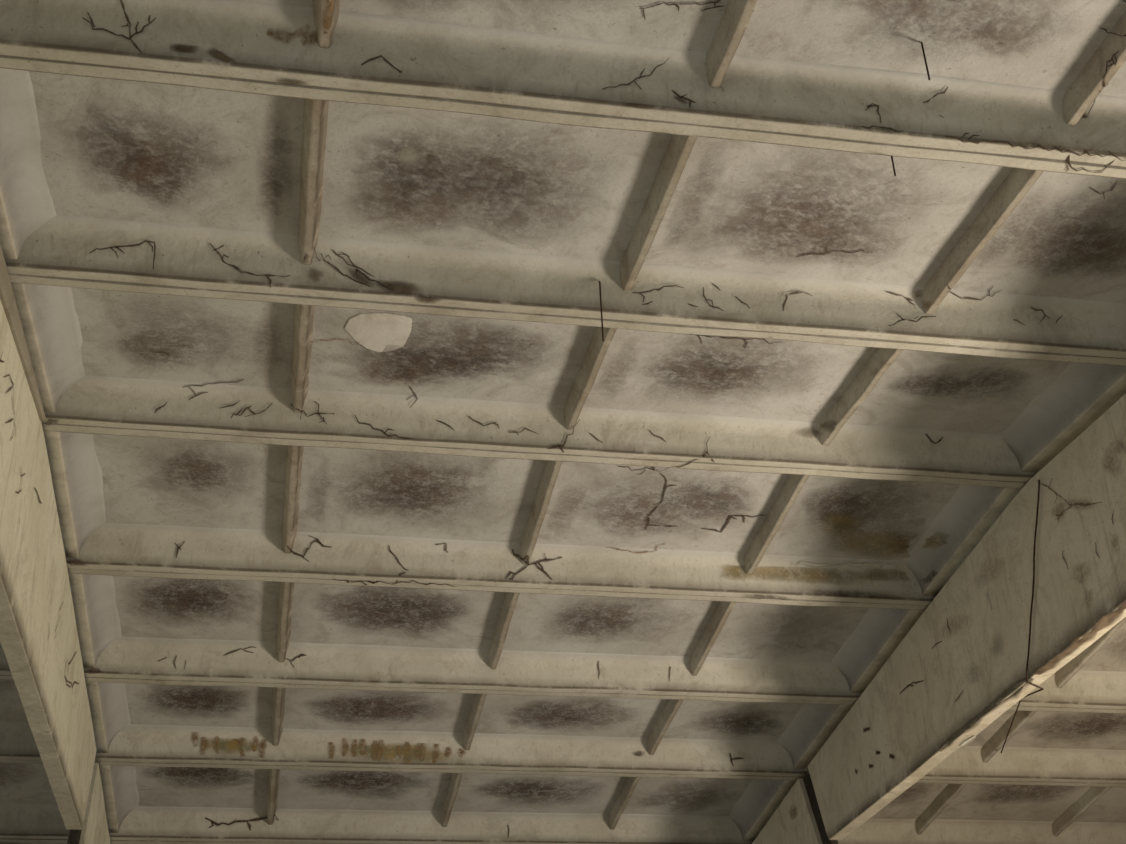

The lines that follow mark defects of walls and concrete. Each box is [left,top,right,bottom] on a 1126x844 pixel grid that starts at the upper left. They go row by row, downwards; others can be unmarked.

crack [83,0,156,53]
crack [639,0,724,20]
crack [90,240,156,270]
peeling [344,313,412,352]
crack [154,379,413,439]
crack [437,416,603,452]
crack [610,430,764,553]
crack [506,549,562,580]
corrosion [329,738,464,764]